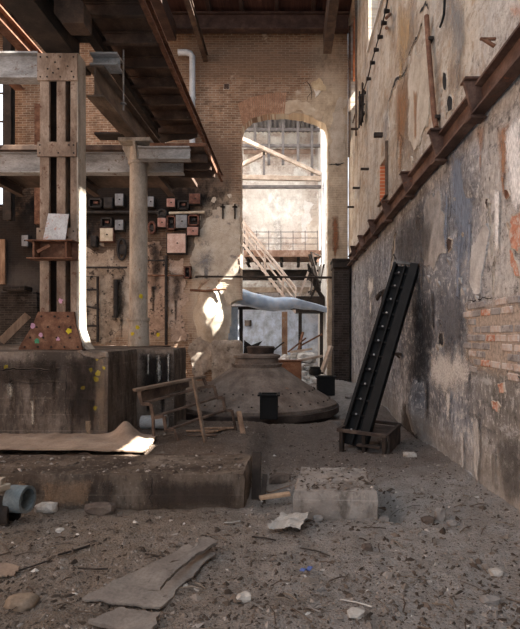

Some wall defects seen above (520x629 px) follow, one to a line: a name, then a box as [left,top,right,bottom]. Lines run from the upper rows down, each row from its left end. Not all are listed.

crack [387,1,428,155]
corrosion [397,91,406,168]
corrosion [499,127,509,194]
peeling [506,211,520,278]
flaking render [459,223,520,413]